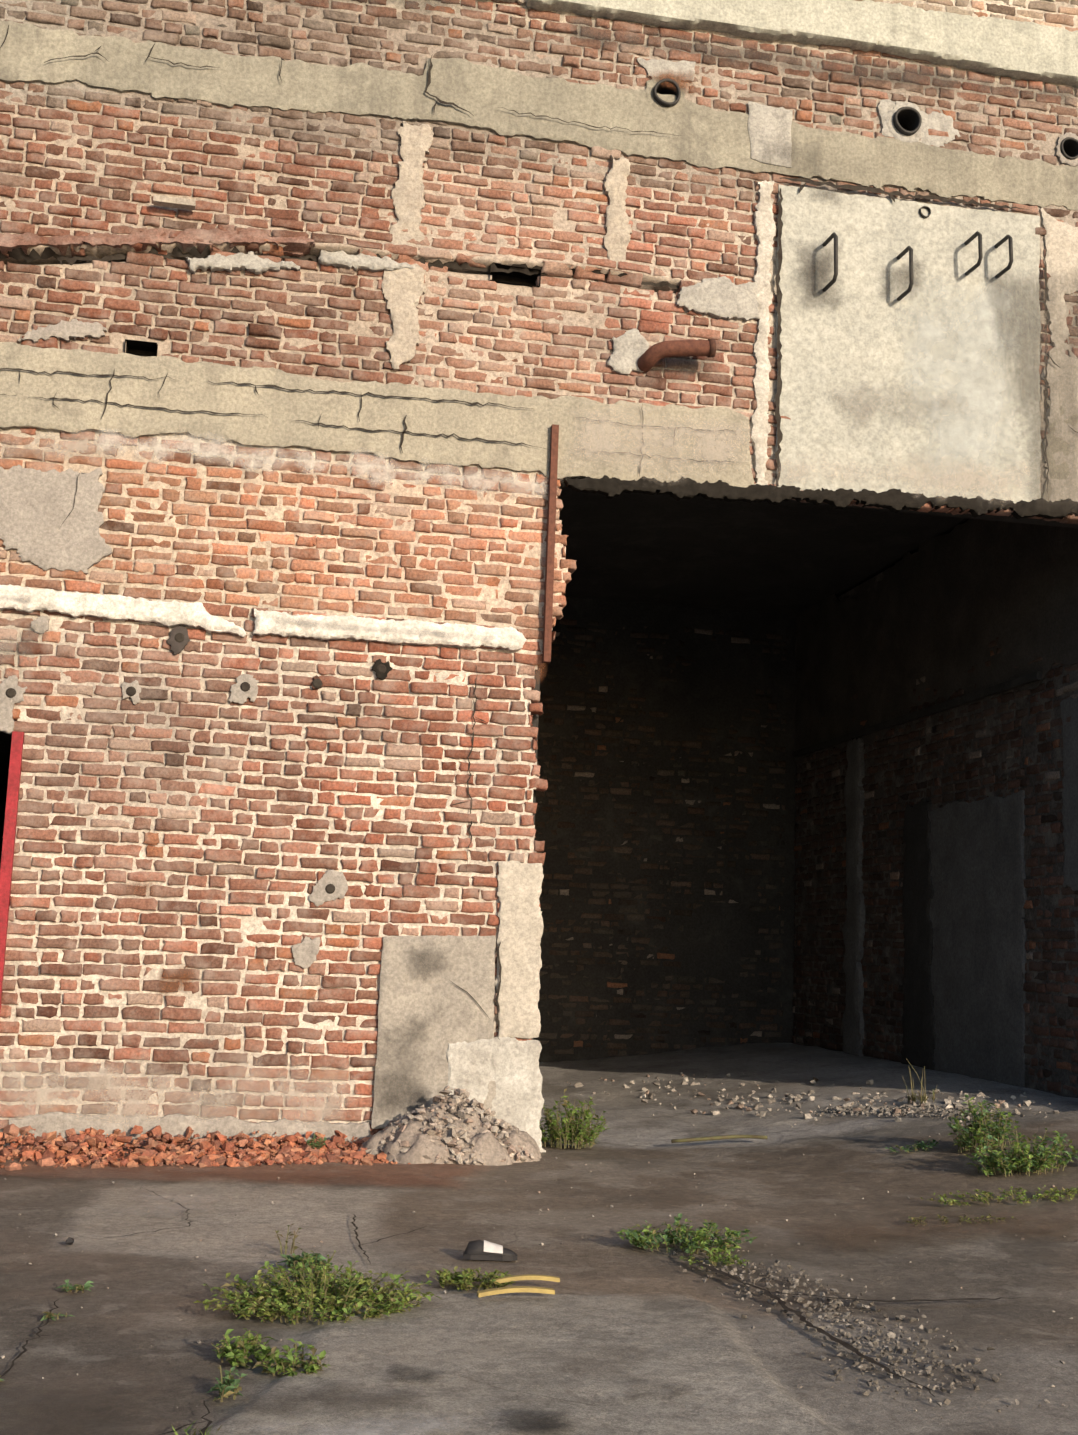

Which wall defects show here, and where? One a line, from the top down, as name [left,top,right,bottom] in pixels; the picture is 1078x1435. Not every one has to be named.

crack [425,54,679,136]
crack [0,177,1030,486]
crack [159,1400,213,1435]